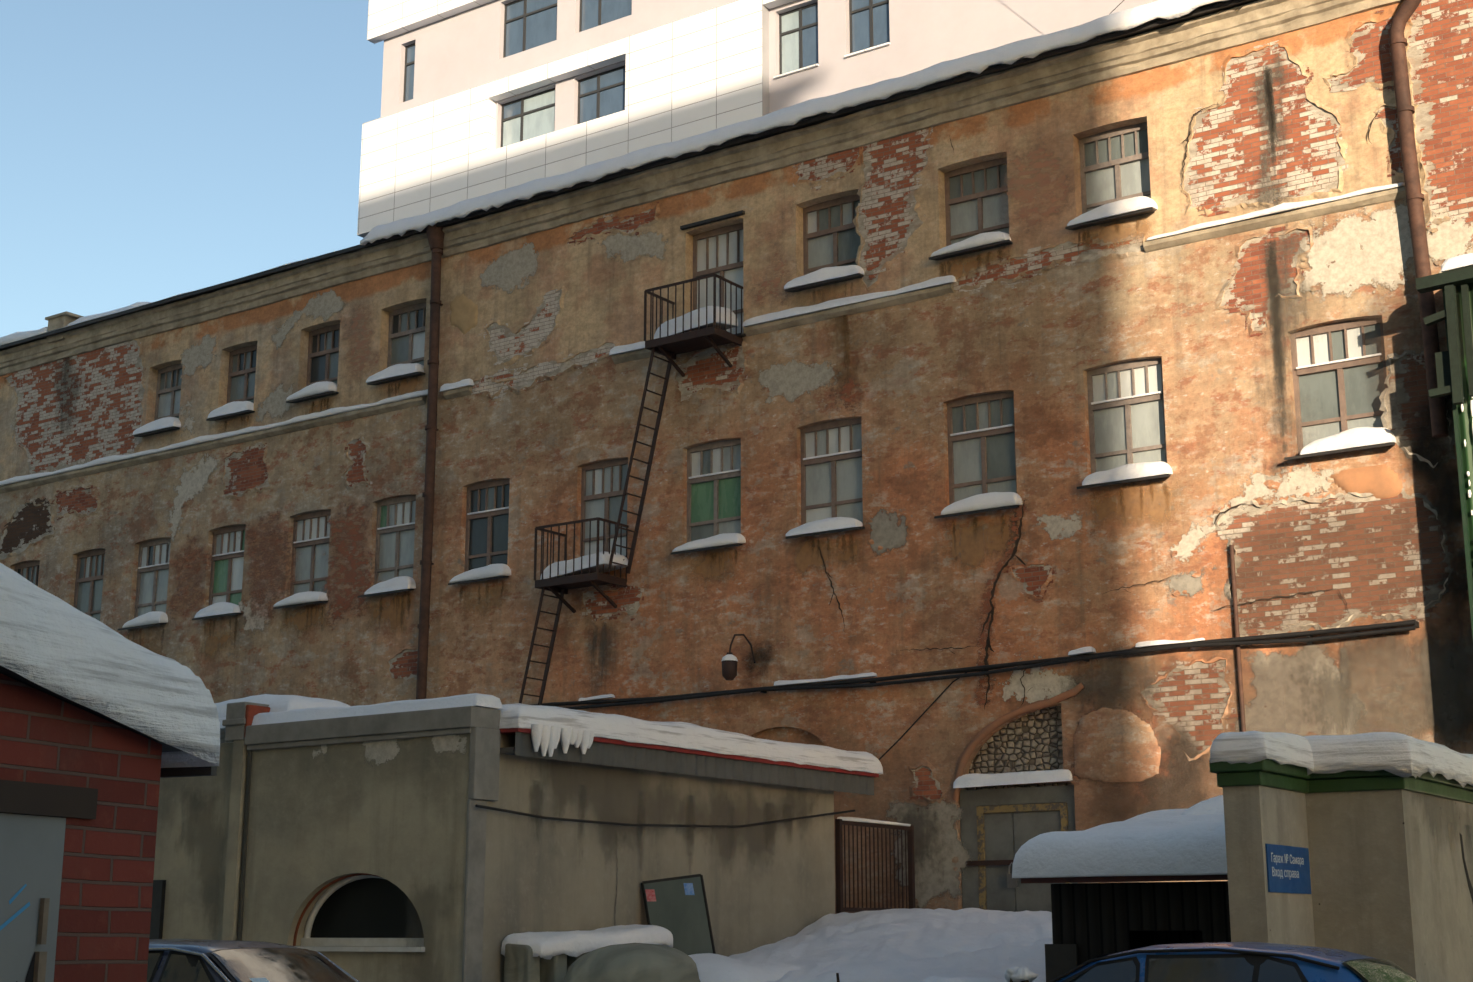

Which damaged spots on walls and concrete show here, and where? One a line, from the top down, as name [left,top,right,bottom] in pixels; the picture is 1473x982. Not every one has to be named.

spalling [792,127,933,292]
spalling [944,230,1149,296]
spalling [1180,0,1473,337]
spalling [0,338,146,564]
spalling [167,440,271,544]
crack [818,543,845,628]
crack [901,500,1030,710]
spalling [1004,559,1057,603]
spalling [1138,454,1455,761]